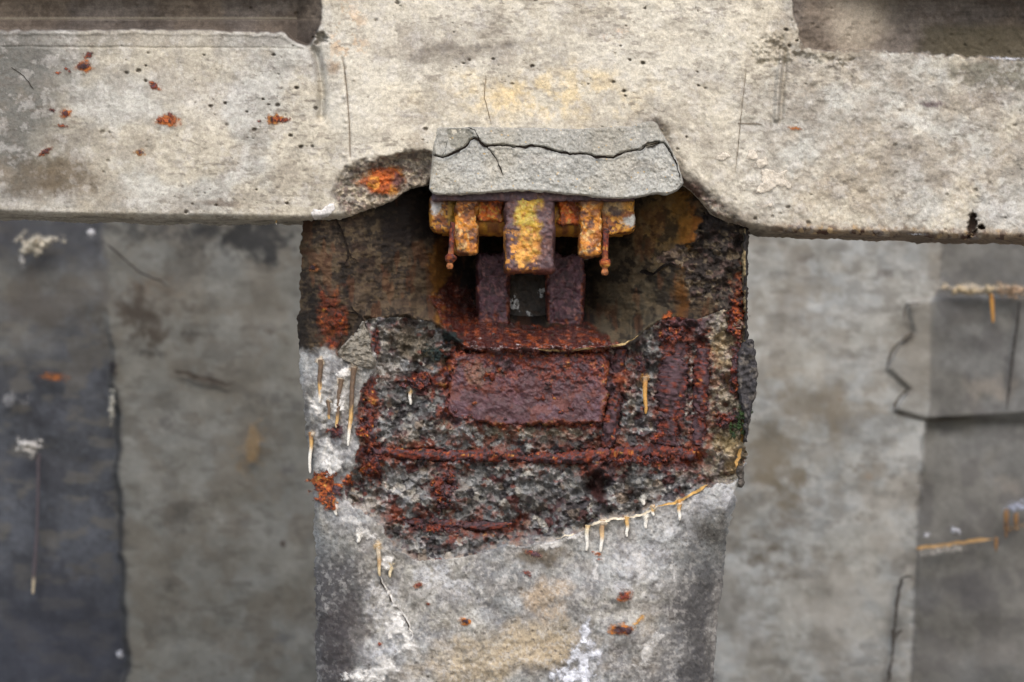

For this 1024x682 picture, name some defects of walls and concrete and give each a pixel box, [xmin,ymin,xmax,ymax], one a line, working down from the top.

rust [55,52,93,74]
rust [156,112,181,127]
rust [258,113,291,124]
crack [434,81,681,181]
spalling [311,150,432,220]
rust [360,167,406,194]
rust [428,278,619,356]
crack [886,303,920,369]
spalling [337,163,758,561]
rust [326,424,343,439]
rust [306,470,356,510]
rust [610,615,643,635]